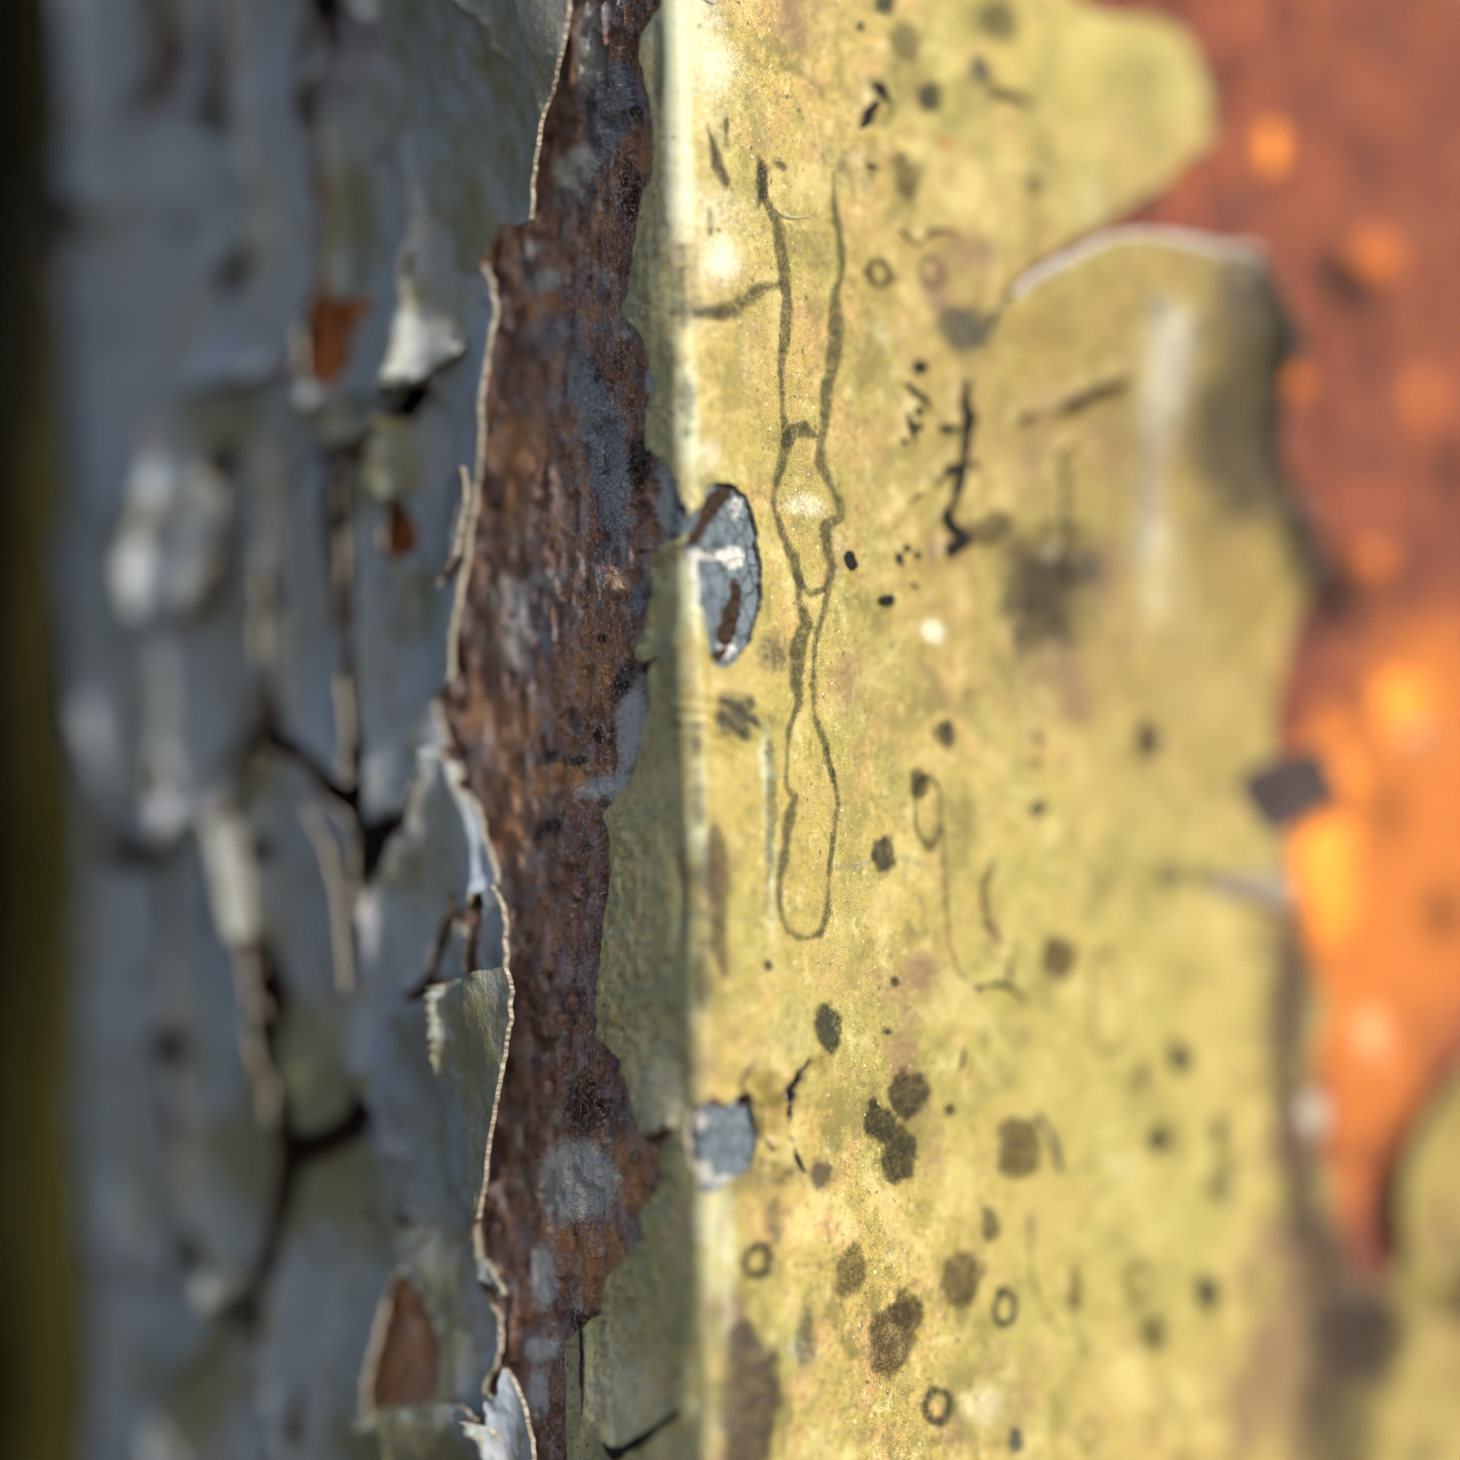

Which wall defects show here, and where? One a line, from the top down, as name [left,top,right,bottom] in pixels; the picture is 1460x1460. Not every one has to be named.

peeling [291,0,468,573]
peeling [107,419,219,625]
crack [224,636,335,819]
rust [382,0,680,1460]
peeling [670,482,759,668]
leakage [757,161,845,939]
rust [987,0,1460,1294]
crack [255,935,295,1140]
crack [409,893,484,1004]
leakage [814,1004,841,1054]
leakage [865,1072,931,1183]
peeling [354,1274,503,1460]